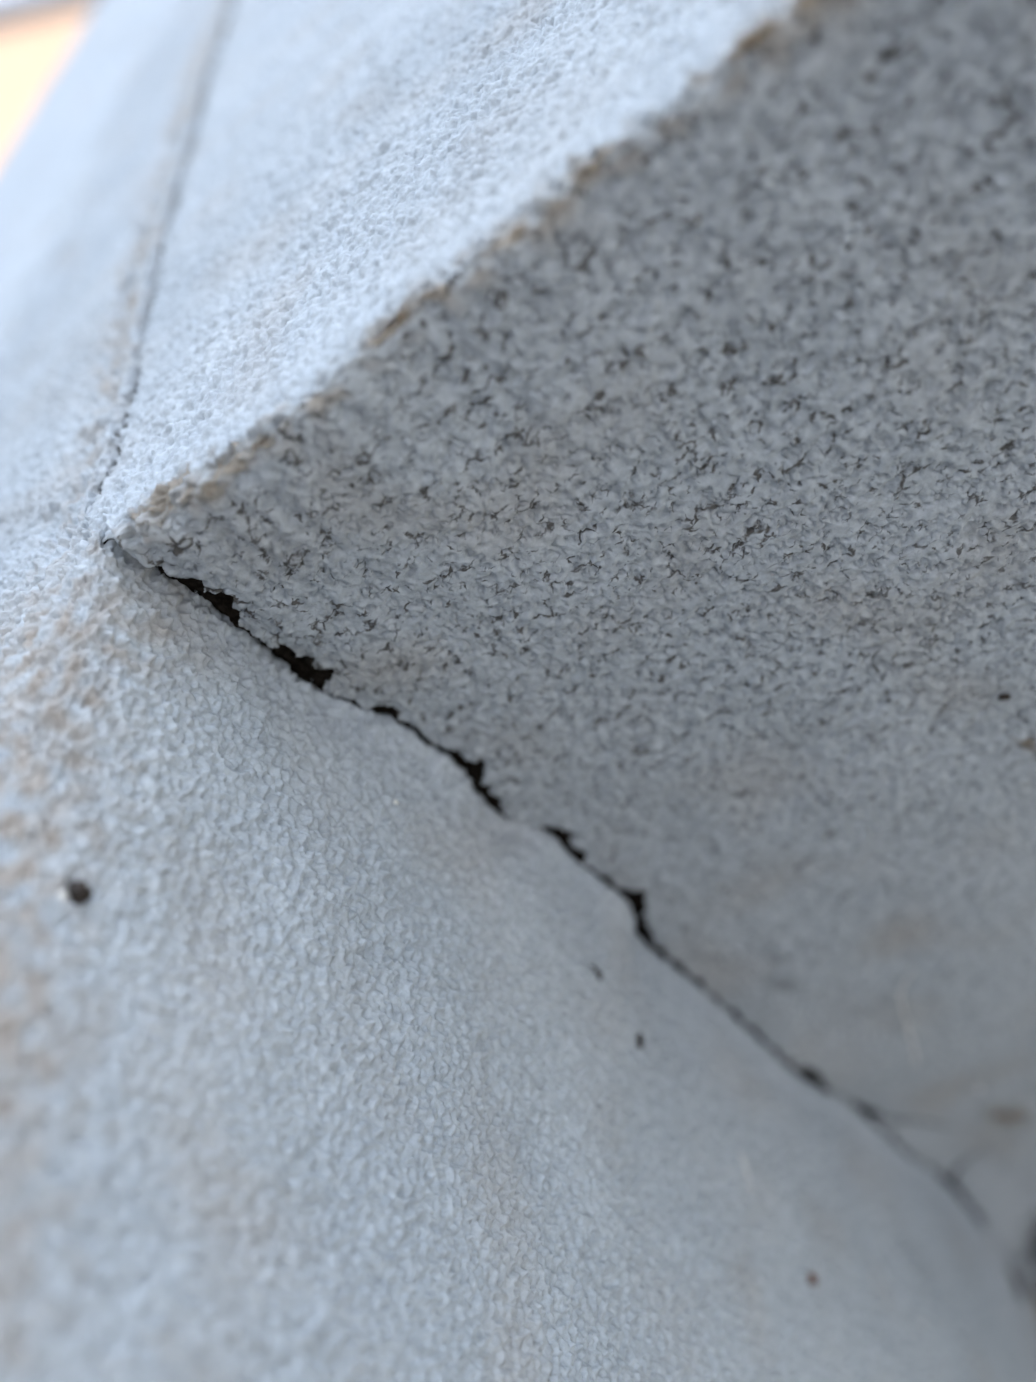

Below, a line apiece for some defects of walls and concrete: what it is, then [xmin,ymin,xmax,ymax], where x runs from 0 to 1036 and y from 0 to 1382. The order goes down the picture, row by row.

crack [152,566,1028,1279]